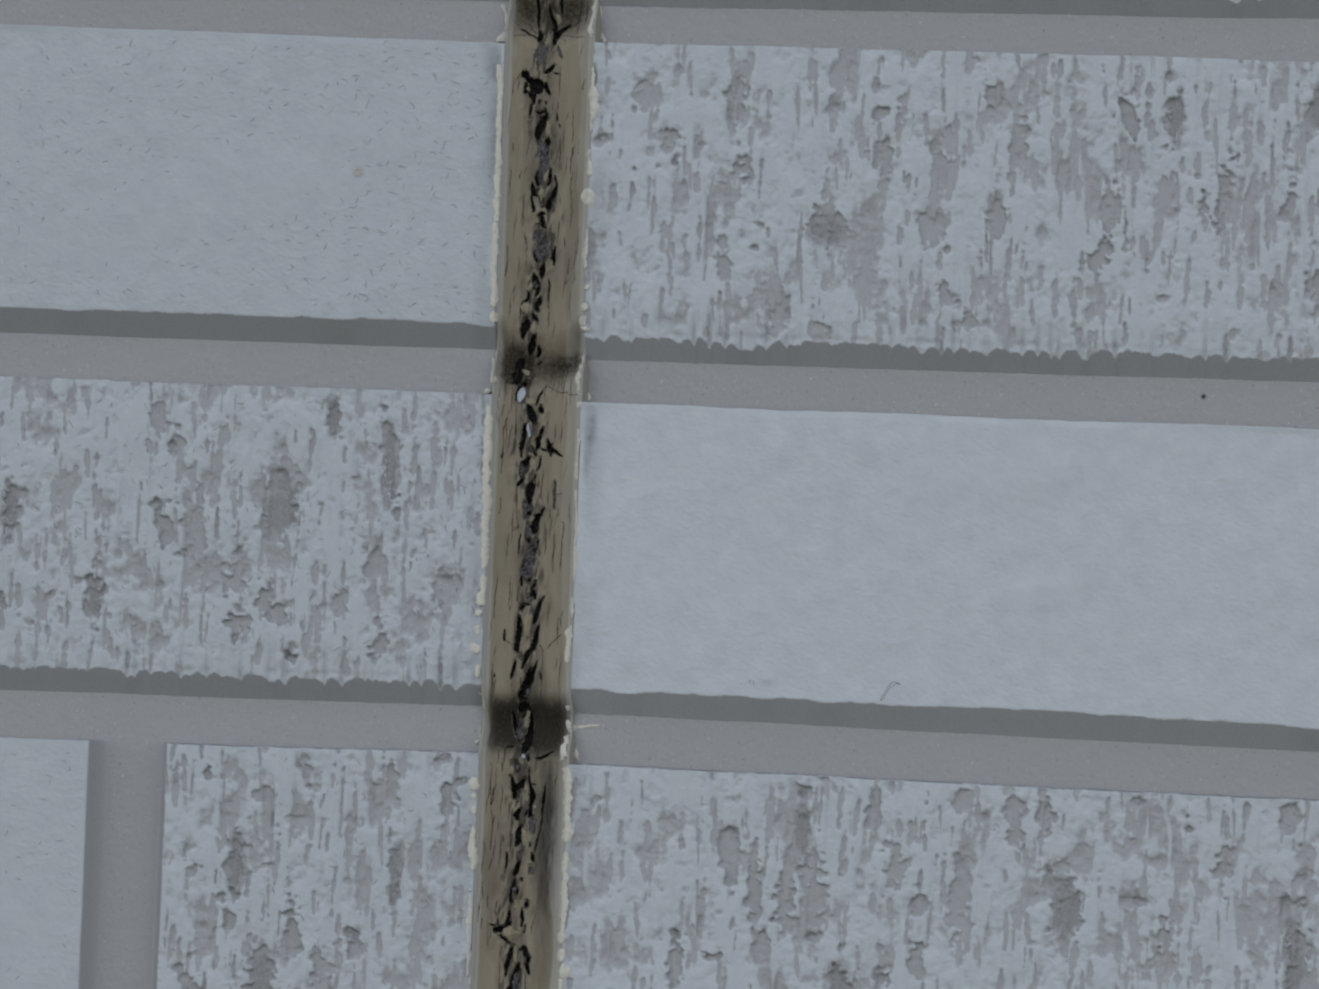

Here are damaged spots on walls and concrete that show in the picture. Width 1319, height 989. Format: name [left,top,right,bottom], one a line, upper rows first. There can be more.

crack [0,0,589,989]